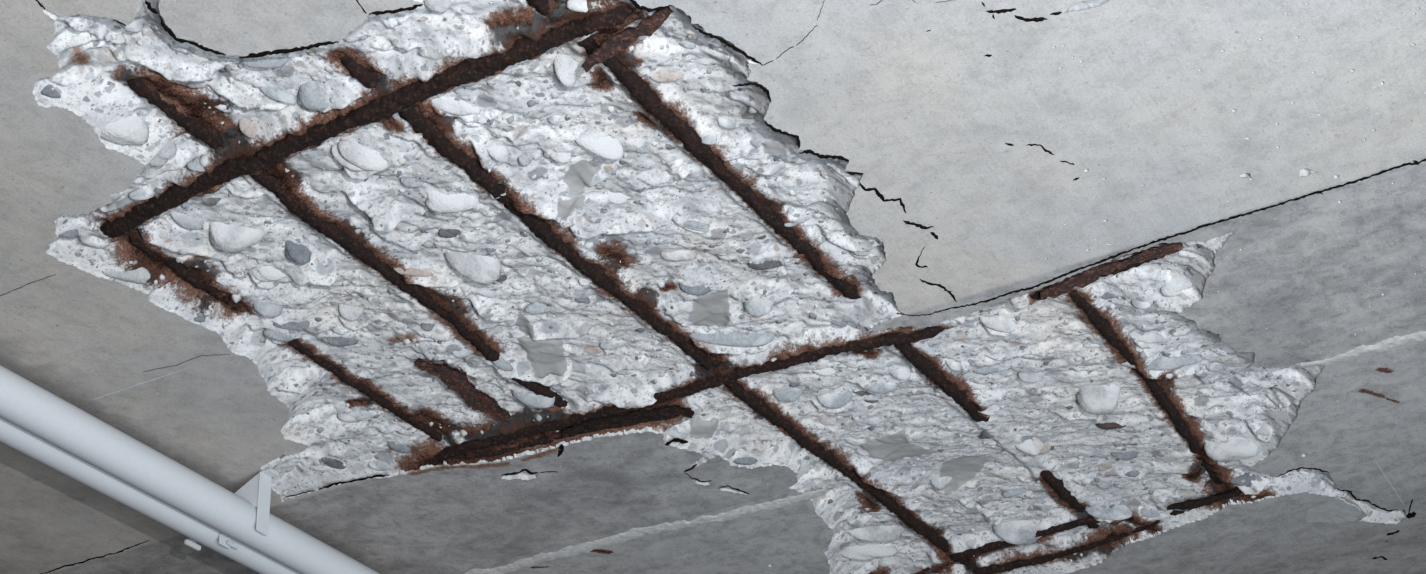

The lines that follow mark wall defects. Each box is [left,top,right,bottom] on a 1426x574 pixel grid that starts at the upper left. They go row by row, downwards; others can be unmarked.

crack [113,0,339,58]
crack [356,0,423,15]
spalling [32,0,946,574]
rust [91,0,1164,574]
crack [629,0,1426,316]
spalling [738,232,1407,574]
rust [1027,242,1276,510]